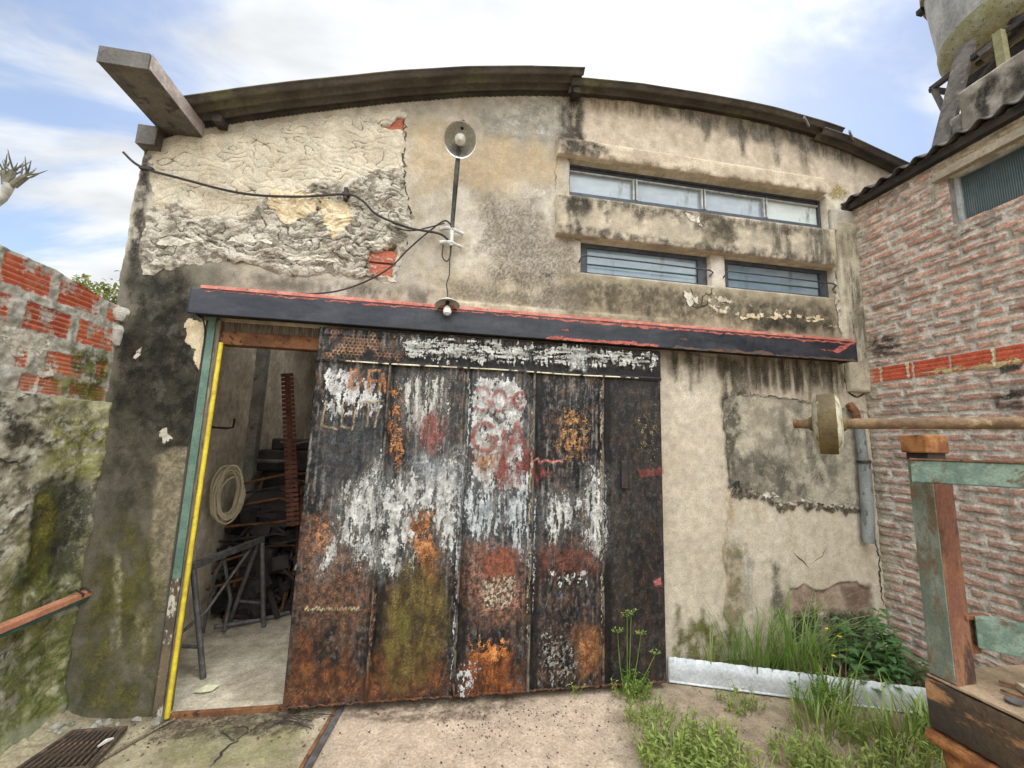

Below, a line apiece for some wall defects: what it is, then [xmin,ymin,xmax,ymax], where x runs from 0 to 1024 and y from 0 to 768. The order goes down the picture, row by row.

spalling [383,119,405,130]
leakage [474,96,614,160]
spalling [368,248,397,278]
leakage [452,181,866,338]
peeling [184,318,206,370]
leakage [14,150,200,608]
leakage [670,352,844,407]
corrosion [553,407,592,464]
peeling [206,281,873,697]
corrosion [285,502,448,706]
corrosion [464,539,525,697]
corrosion [537,626,601,688]